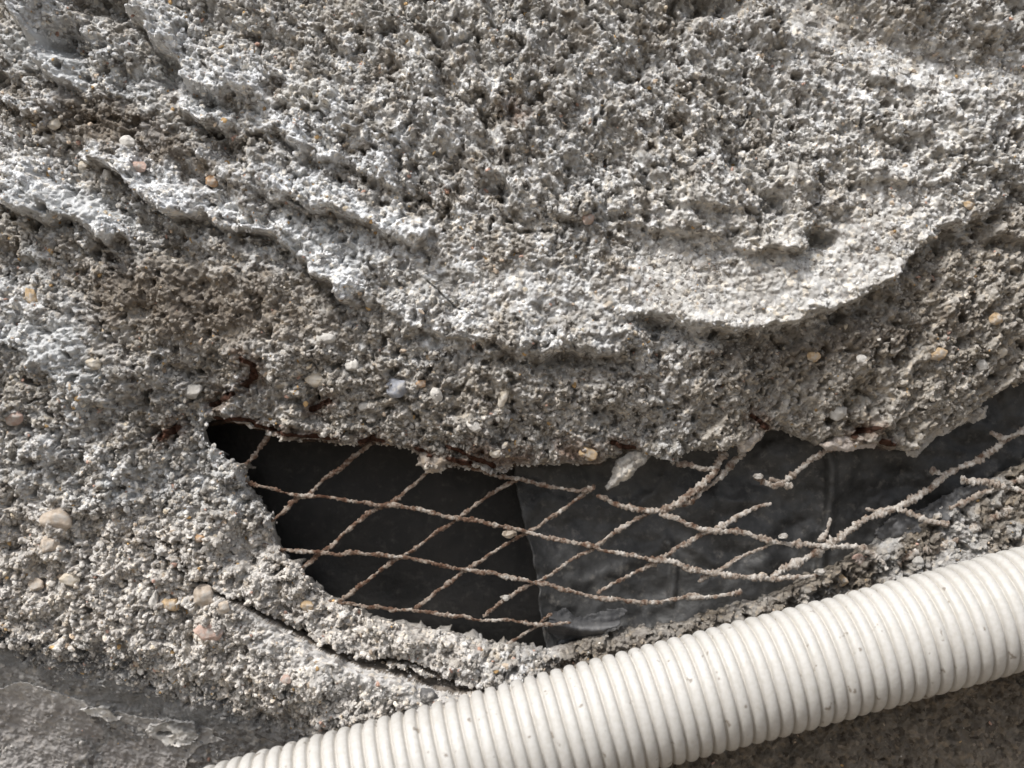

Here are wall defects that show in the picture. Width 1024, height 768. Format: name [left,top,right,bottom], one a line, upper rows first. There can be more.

spalling [487,195,1024,491]
rust [209,356,337,441]
rust [357,435,386,444]
rust [414,445,496,469]
rust [610,440,636,450]
rust [851,426,897,447]
spalling [199,417,881,654]
crack [134,536,485,696]